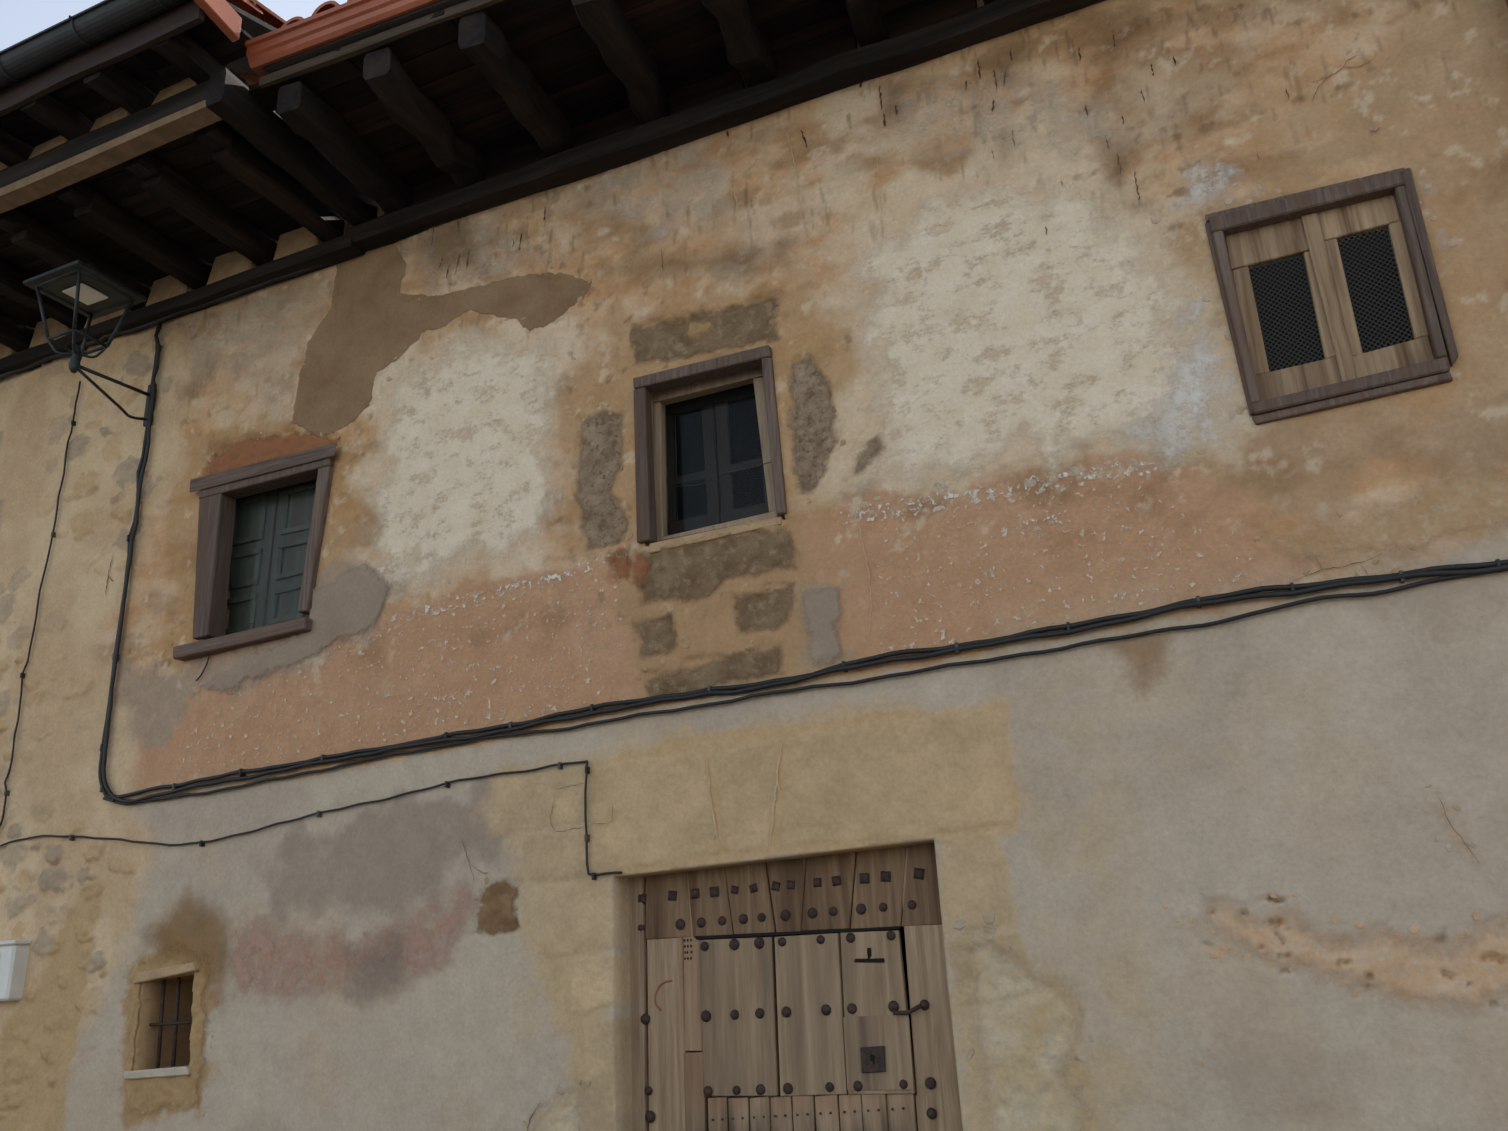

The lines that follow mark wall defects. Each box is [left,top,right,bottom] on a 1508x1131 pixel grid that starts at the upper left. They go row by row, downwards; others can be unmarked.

peeling [1184,161,1253,205]
peeling [176,244,796,774]
peeling [787,186,1252,654]
spalling [473,877,518,935]
spalling [954,911,1094,1131]
spalling [1210,892,1508,1005]